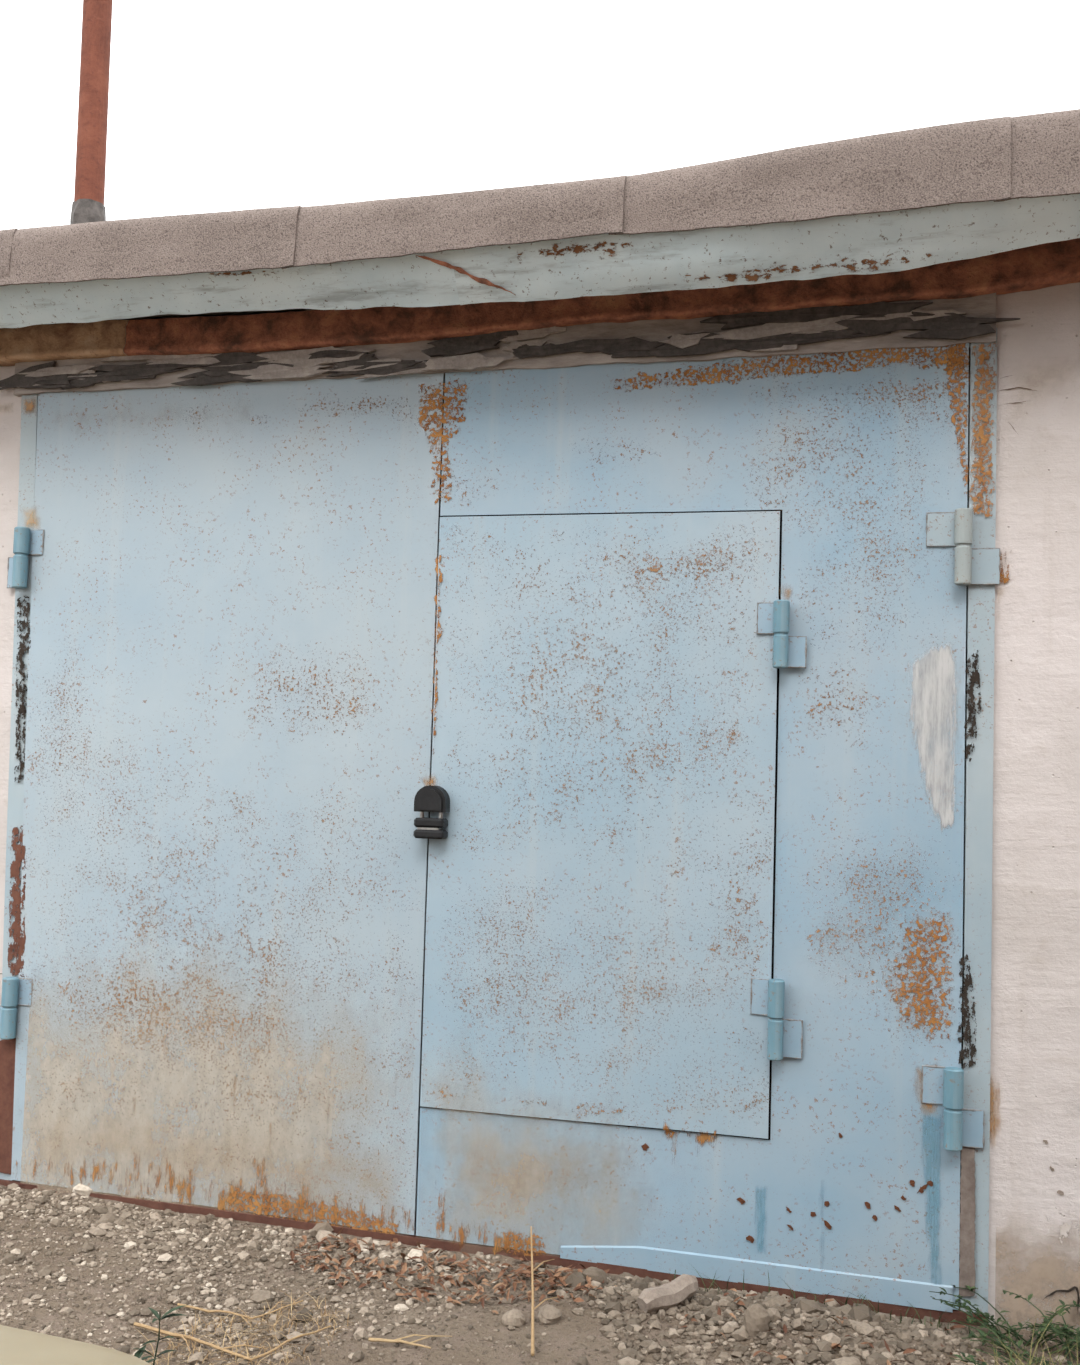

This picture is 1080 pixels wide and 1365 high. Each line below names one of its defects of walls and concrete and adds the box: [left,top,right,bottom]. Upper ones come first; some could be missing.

peeling [0,301,1020,390]
rust [305,380,499,505]
rust [799,664,882,747]
rust [427,526,772,1154]
rust [23,637,416,1234]
rust [806,837,955,1049]
rust [436,1197,546,1256]
crack [1044,1286,1080,1311]